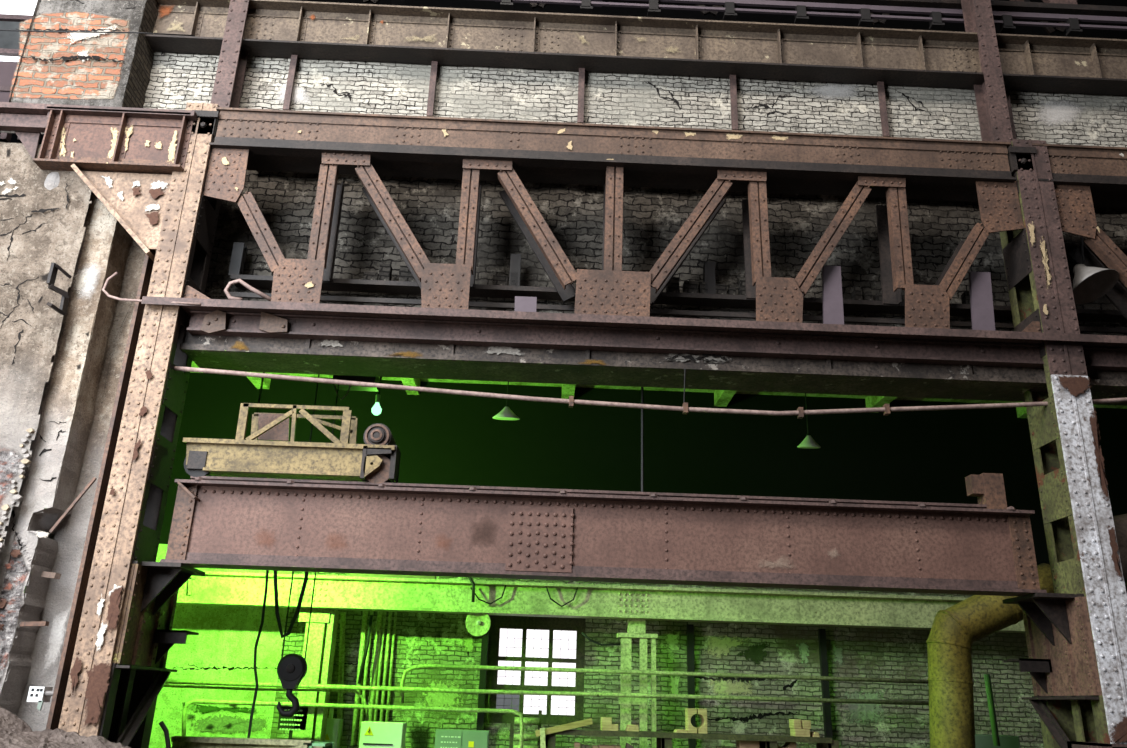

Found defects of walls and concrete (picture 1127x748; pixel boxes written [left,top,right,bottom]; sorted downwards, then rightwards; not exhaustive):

spalling [10,0,130,99]
peeling [59,128,76,158]
peeling [107,125,133,159]
peeling [145,130,178,164]
crack [0,194,55,364]
peeling [1028,221,1052,315]
rust [1055,375,1090,397]
rust [1089,410,1111,506]
spalling [0,428,35,678]
rust [1108,525,1123,577]
rust [1109,716,1127,744]